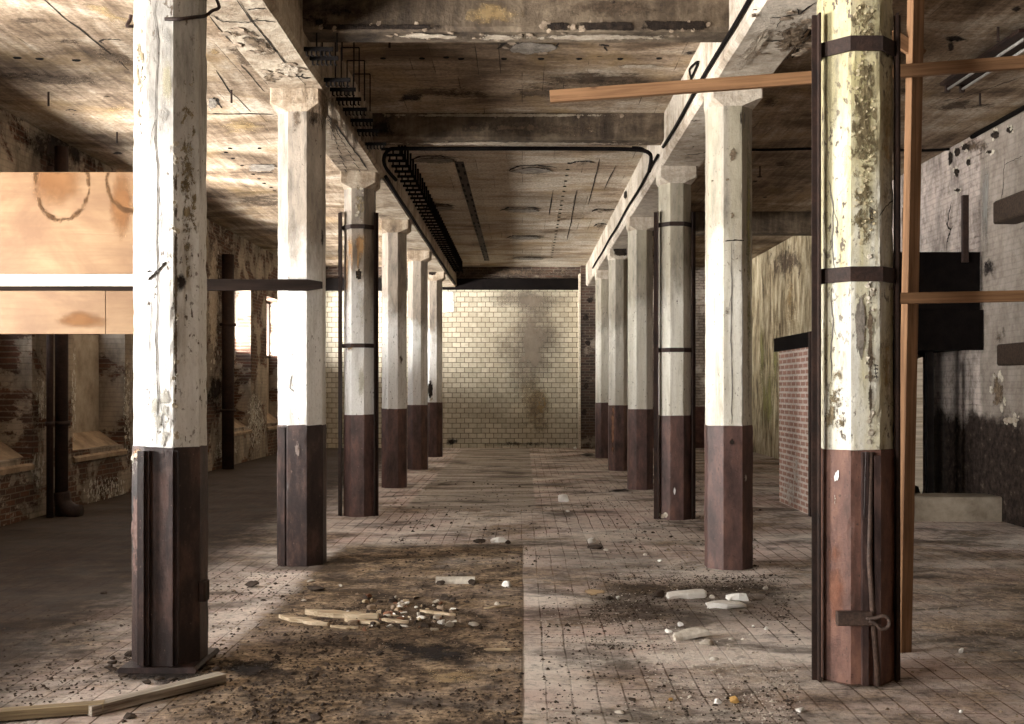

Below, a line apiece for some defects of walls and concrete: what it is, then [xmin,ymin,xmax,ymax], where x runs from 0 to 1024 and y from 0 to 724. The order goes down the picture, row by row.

peeling [851,1,875,35]
peeling [851,51,878,260]
spalling [985,125,1014,156]
peeling [147,101,197,445]
damp [505,293,554,430]
peeling [825,371,847,436]
spalling [855,281,875,444]
spalling [989,370,1020,427]